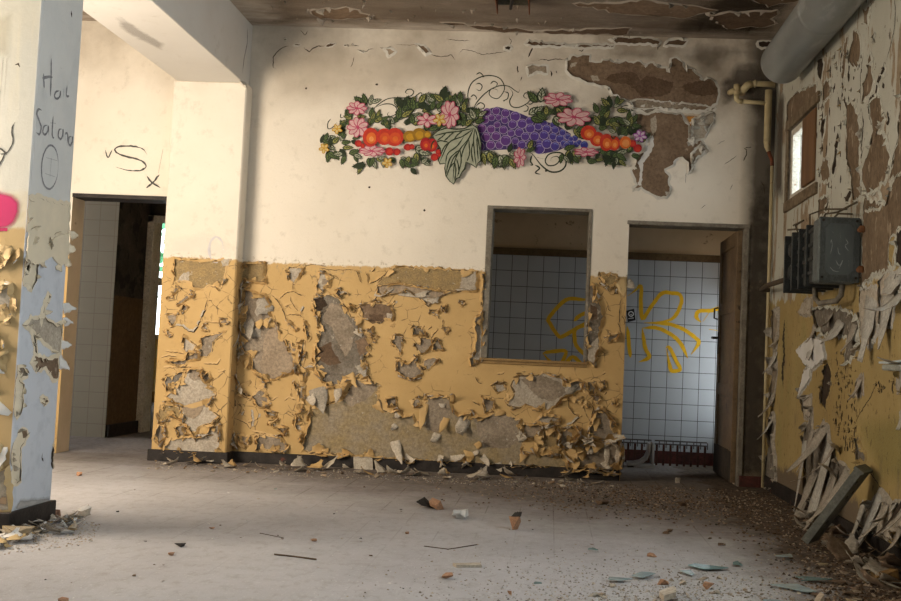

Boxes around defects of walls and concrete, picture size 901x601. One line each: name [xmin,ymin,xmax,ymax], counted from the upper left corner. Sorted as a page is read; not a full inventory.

peeling [306,0,375,26]
crack [396,38,583,81]
peeling [440,2,720,200]
peeling [572,0,799,29]
peeling [0,193,79,513]
peeling [152,257,626,477]
peeling [583,272,637,368]
peeling [756,28,901,531]